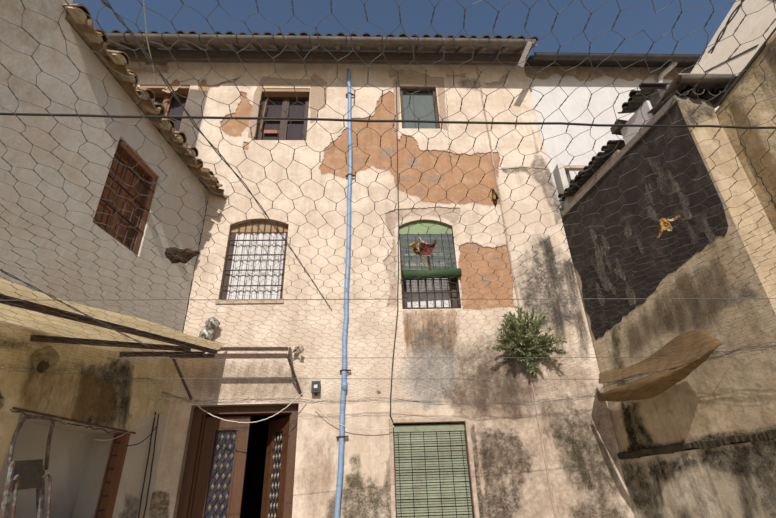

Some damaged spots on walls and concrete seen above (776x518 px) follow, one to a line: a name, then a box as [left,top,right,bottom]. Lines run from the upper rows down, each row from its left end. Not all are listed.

flaking render [197,74,327,151]
flaking render [318,76,502,307]
crack [724,105,776,208]
flaking render [458,242,516,311]
damp [523,238,587,353]
damp [21,359,133,425]
damp [472,426,529,518]
damp [622,404,776,518]